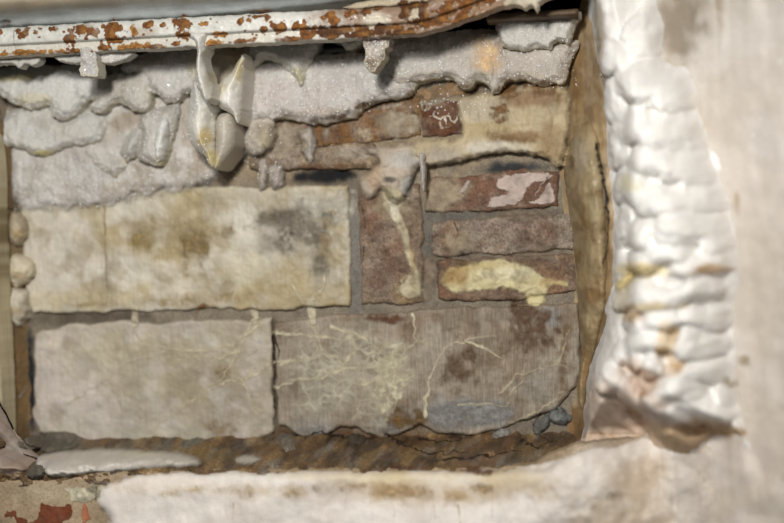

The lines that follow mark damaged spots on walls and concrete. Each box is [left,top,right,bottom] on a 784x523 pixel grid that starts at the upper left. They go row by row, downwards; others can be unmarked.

corrosion [0,0,496,56]
efflorescence [255,116,308,160]
water stain [356,101,418,141]
water stain [489,81,556,123]
water stain [294,190,354,223]
peeling [487,172,555,207]
crack [595,143,609,243]
spalling [272,208,326,250]
crack [271,334,552,462]
spalling [18,431,83,452]
spalling [0,464,46,482]
peeling [4,483,101,523]